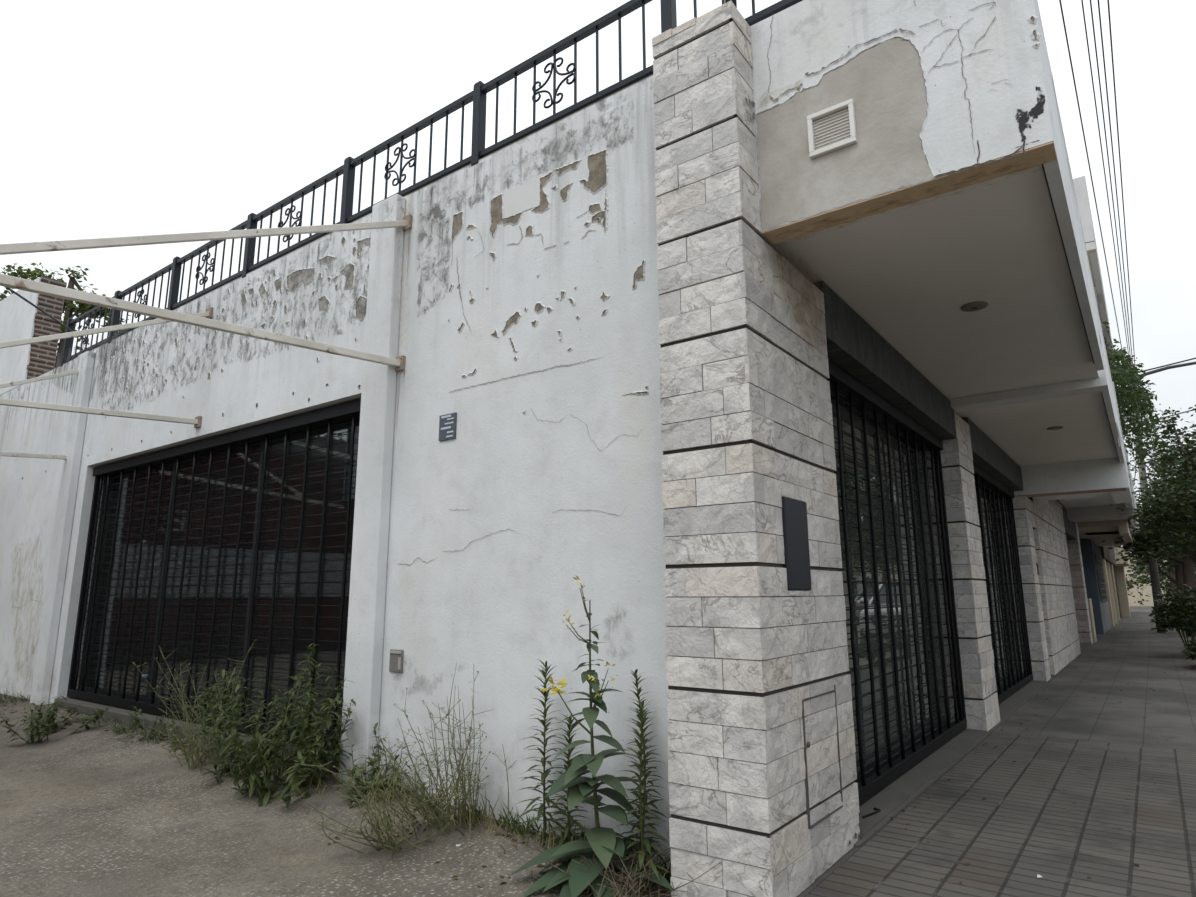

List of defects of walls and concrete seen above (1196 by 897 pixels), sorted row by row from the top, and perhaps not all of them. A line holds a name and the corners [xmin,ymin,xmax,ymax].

spalling [755,28,936,230]
crack [913,1,1026,177]
peeling [451,149,609,262]
peeling [105,230,371,400]
peeling [491,286,580,361]
peeling [632,259,646,290]
crack [406,529,514,566]